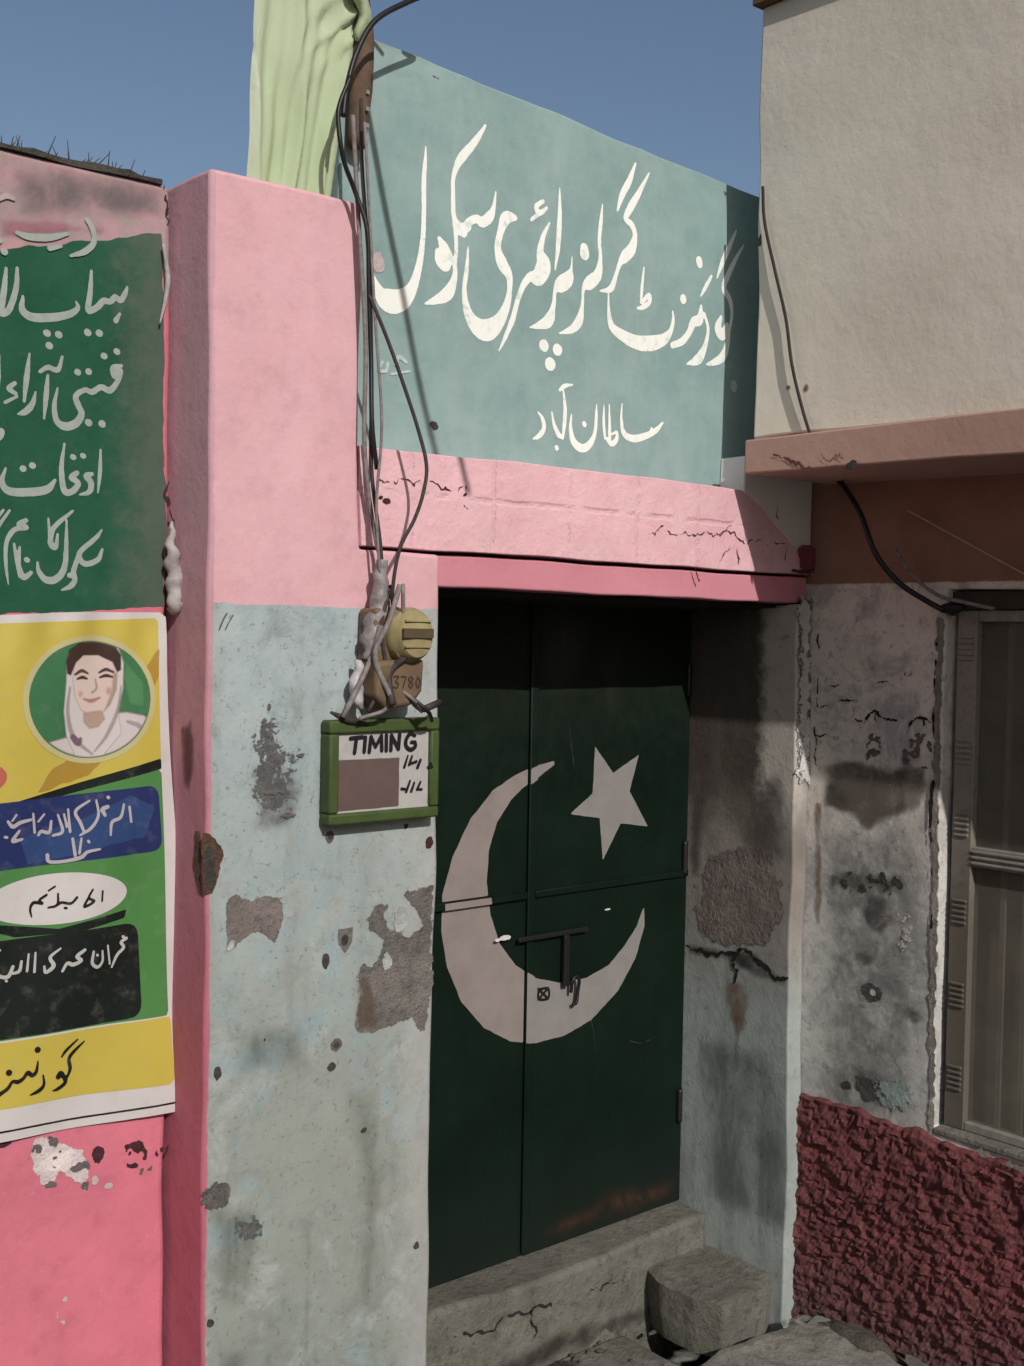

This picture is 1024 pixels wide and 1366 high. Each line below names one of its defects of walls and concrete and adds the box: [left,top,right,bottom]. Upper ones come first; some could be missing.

leakage [826,763,923,828]
flaking render [193,831,224,896]
peeling [226,894,288,951]
flaking render [694,846,784,947]
peeling [322,884,434,1033]
crack [686,945,789,984]
flaking render [327,1038,342,1072]
peeling [28,1136,113,1192]
peeling [125,1140,169,1175]
crack [455,1302,552,1338]